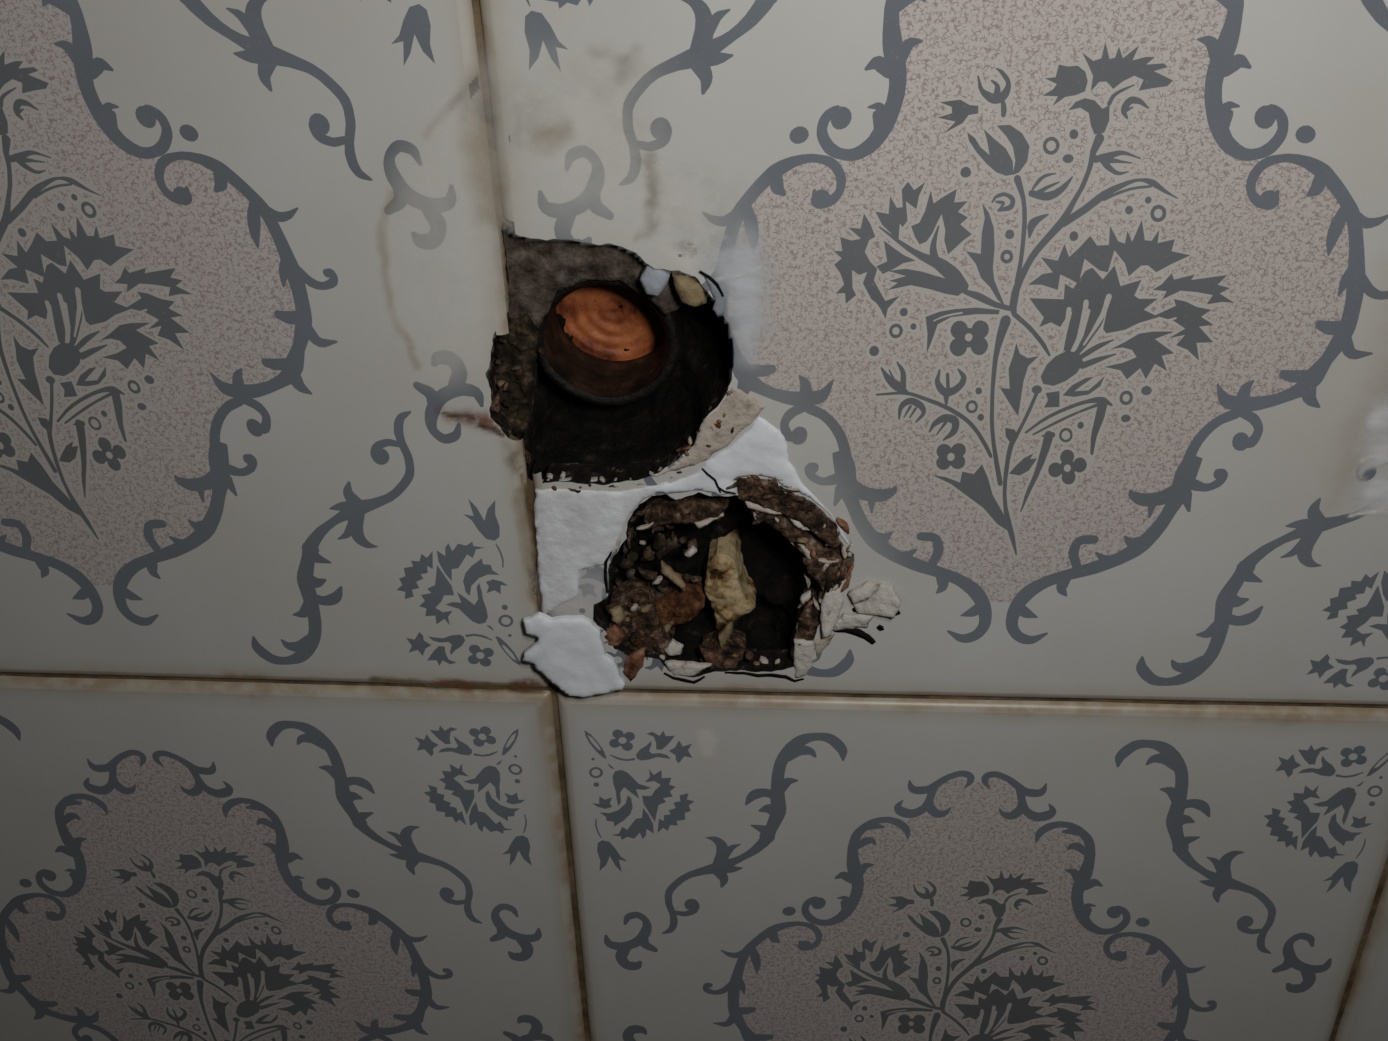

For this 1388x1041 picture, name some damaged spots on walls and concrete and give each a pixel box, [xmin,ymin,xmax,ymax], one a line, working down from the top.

spalling [490,222,901,698]